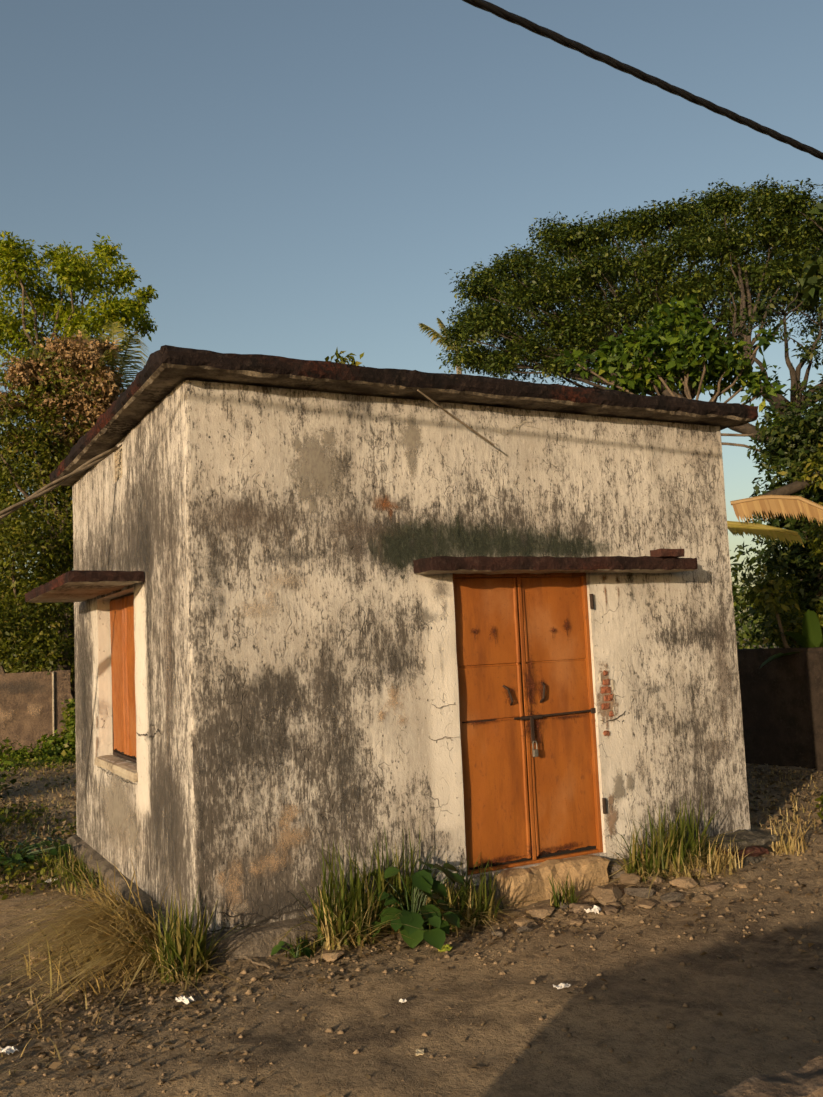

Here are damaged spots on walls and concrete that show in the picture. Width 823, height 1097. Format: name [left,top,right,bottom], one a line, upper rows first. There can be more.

leakage [397,416,422,477]
flaking render [597,663,625,737]